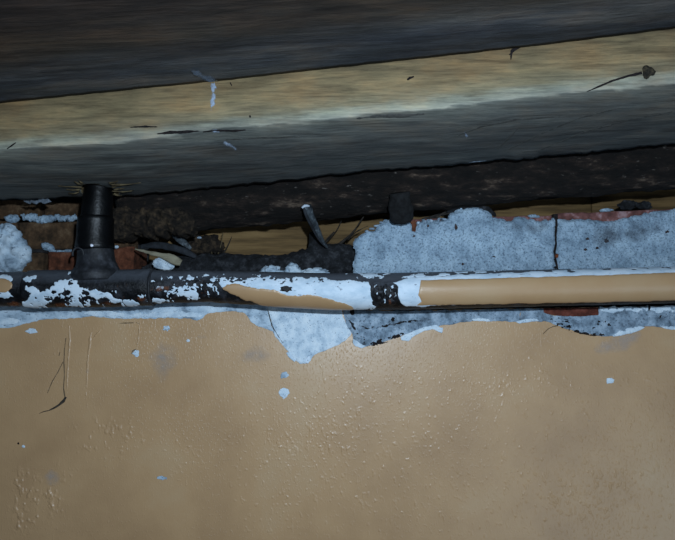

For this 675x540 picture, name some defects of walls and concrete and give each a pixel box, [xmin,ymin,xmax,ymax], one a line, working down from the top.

crack [551,214,559,269]
spalling [0,207,675,364]
crack [39,338,67,414]